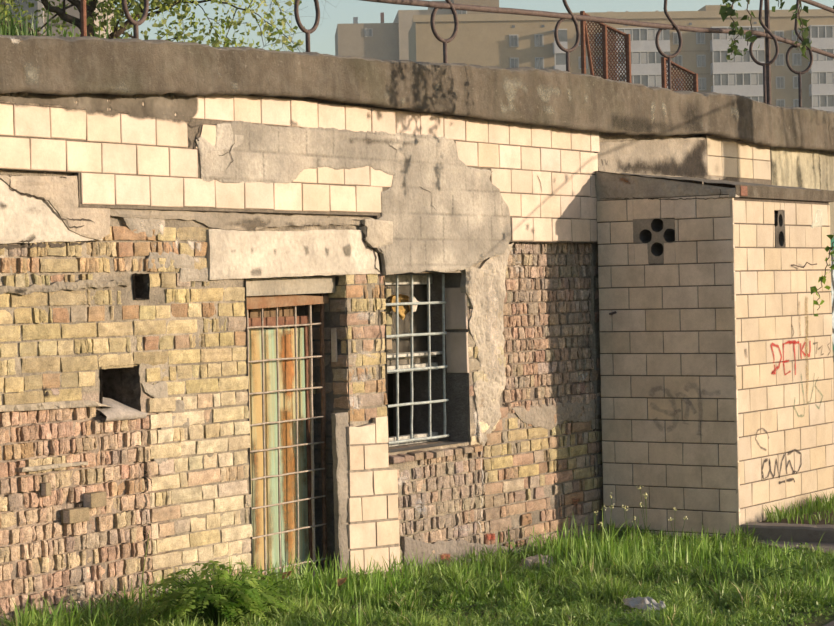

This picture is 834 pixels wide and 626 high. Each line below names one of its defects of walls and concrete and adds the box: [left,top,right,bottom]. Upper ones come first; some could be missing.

leakage [619,140,707,178]
crack [0,174,94,250]
crack [352,219,383,408]
corrosion [281,333,295,397]
corrosion [282,410,306,567]